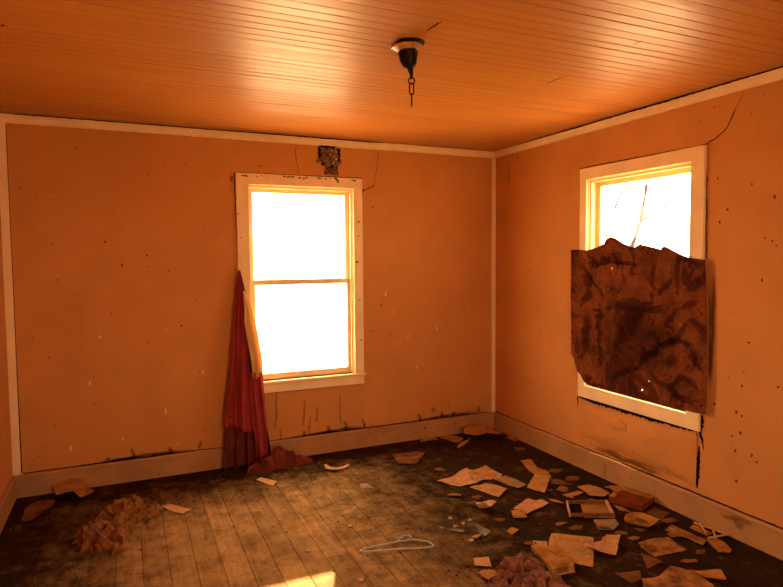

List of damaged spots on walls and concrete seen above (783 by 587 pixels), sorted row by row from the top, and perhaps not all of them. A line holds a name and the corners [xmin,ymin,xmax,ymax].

crack [234,149,379,239]
flaking render [316,145,342,167]
crack [580,94,743,258]
crack [270,396,783,529]